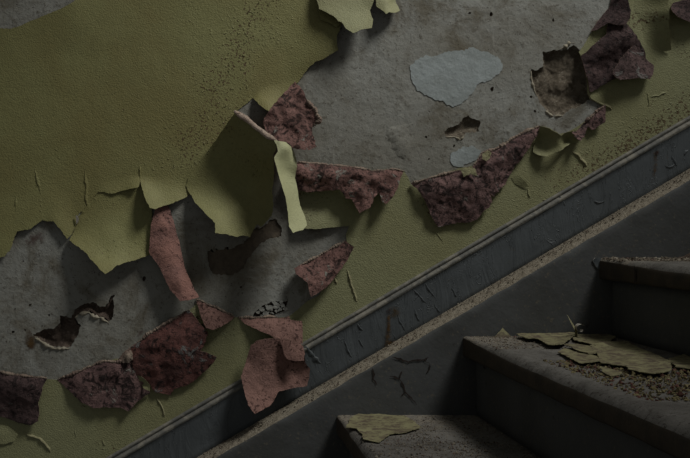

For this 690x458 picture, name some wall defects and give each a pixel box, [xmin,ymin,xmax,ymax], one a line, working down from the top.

peeling [317,0,400,33]
peeling [410,47,503,107]
peeling [530,0,690,118]
peeling [186,82,404,275]
peeling [411,105,606,227]
spalling [34,295,115,351]
peeling [57,184,310,414]
peeling [294,241,354,297]
peeling [0,371,47,444]
crack [372,357,430,405]